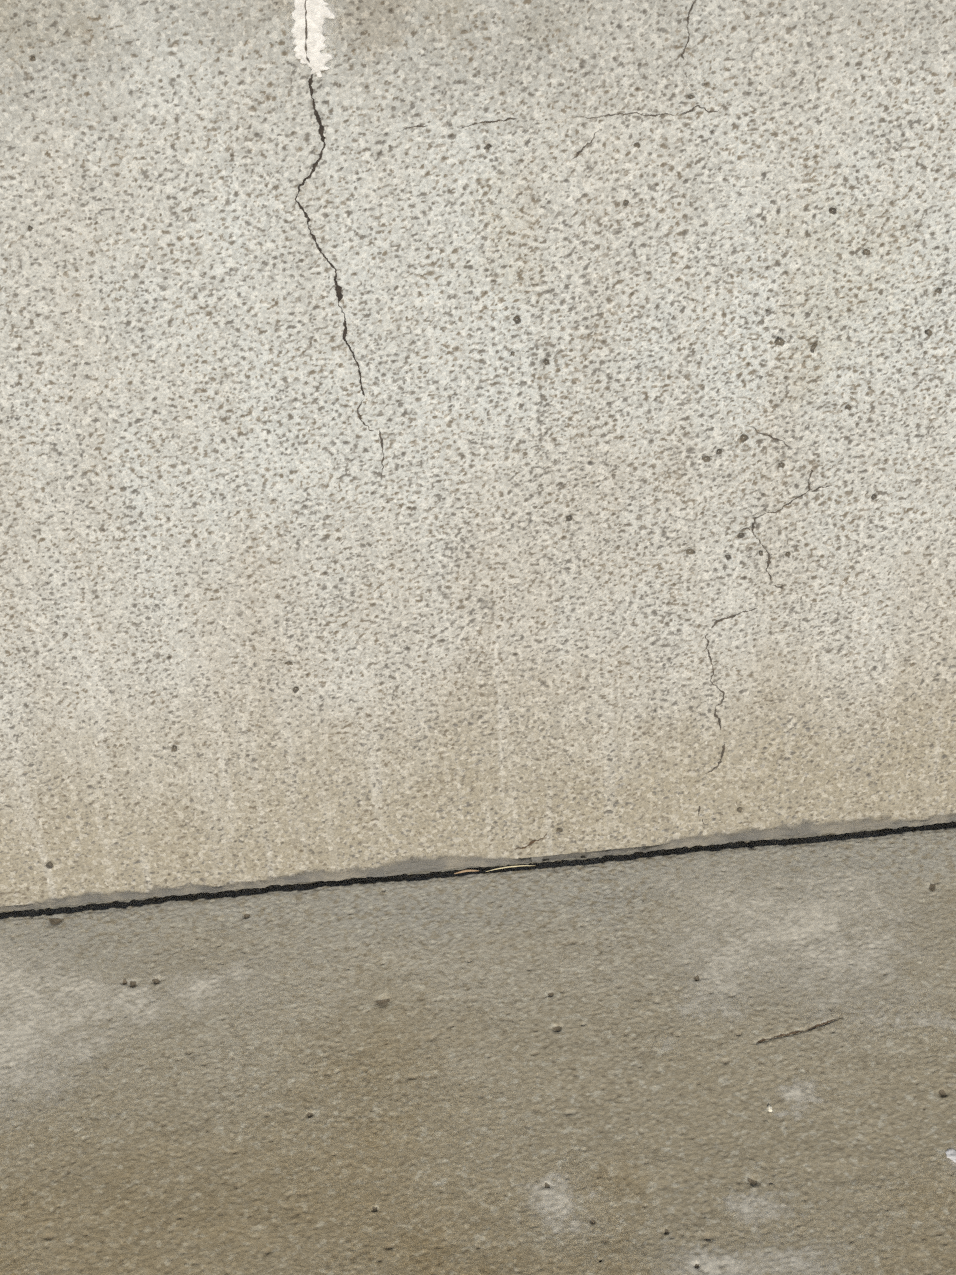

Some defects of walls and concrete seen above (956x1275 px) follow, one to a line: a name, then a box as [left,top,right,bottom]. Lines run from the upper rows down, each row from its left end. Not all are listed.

leakage [290,0,335,78]
crack [295,69,385,476]
crack [705,470,829,774]